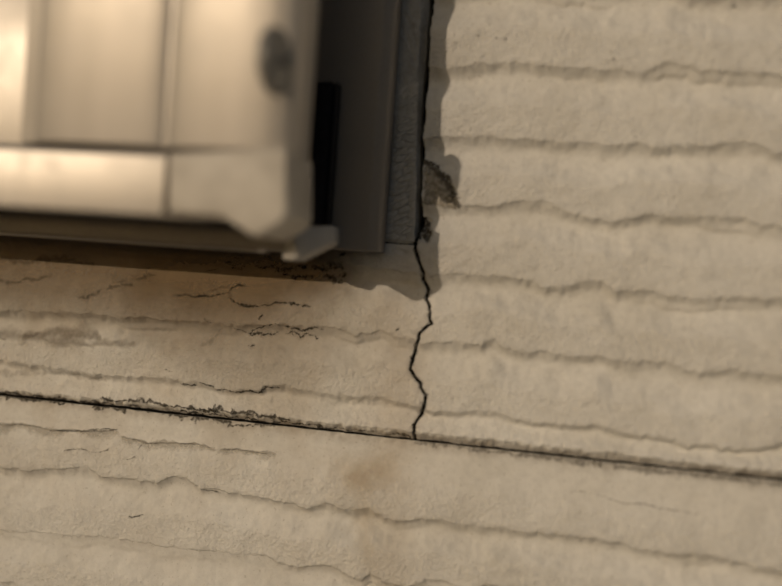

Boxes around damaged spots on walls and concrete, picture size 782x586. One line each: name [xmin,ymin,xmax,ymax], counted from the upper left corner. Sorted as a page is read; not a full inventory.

peeling [385,81,461,242]
crack [171,284,323,346]
crack [409,232,433,439]